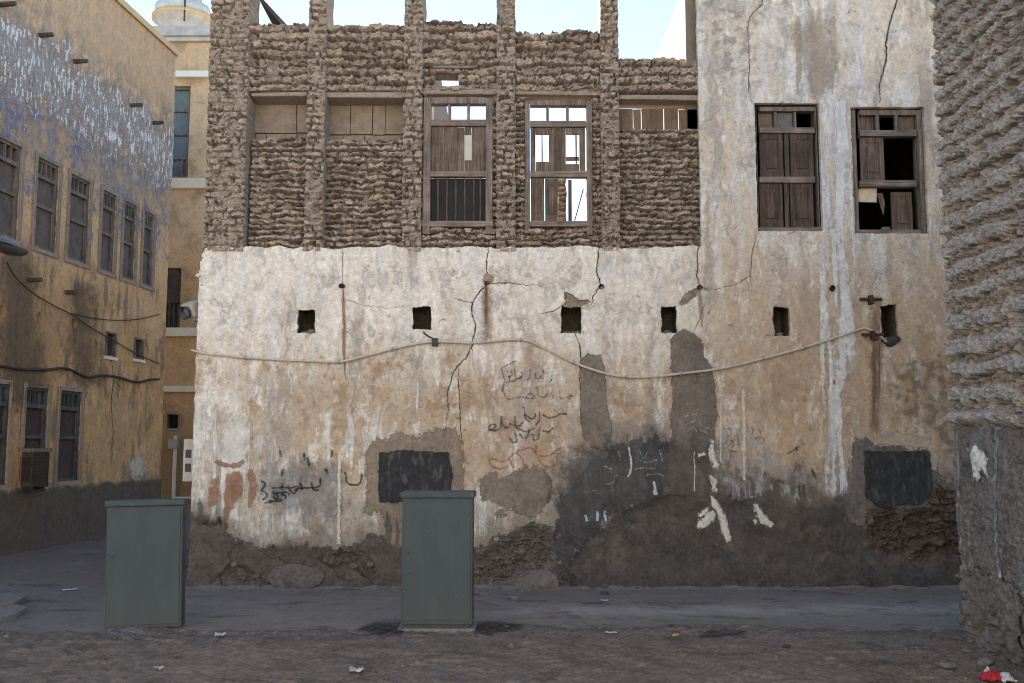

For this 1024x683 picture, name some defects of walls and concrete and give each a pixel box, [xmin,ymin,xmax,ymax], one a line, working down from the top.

crack [747,0,763,96]
crack [879,0,898,103]
spalling [561,292,591,308]
spalling [679,288,698,306]
crack [696,236,757,326]
water stain [519,15,962,588]
crack [445,251,539,468]
rust [871,311,880,430]
water stain [187,393,402,587]
spalling [320,545,380,578]
spalling [474,521,557,586]
spalling [861,488,962,566]